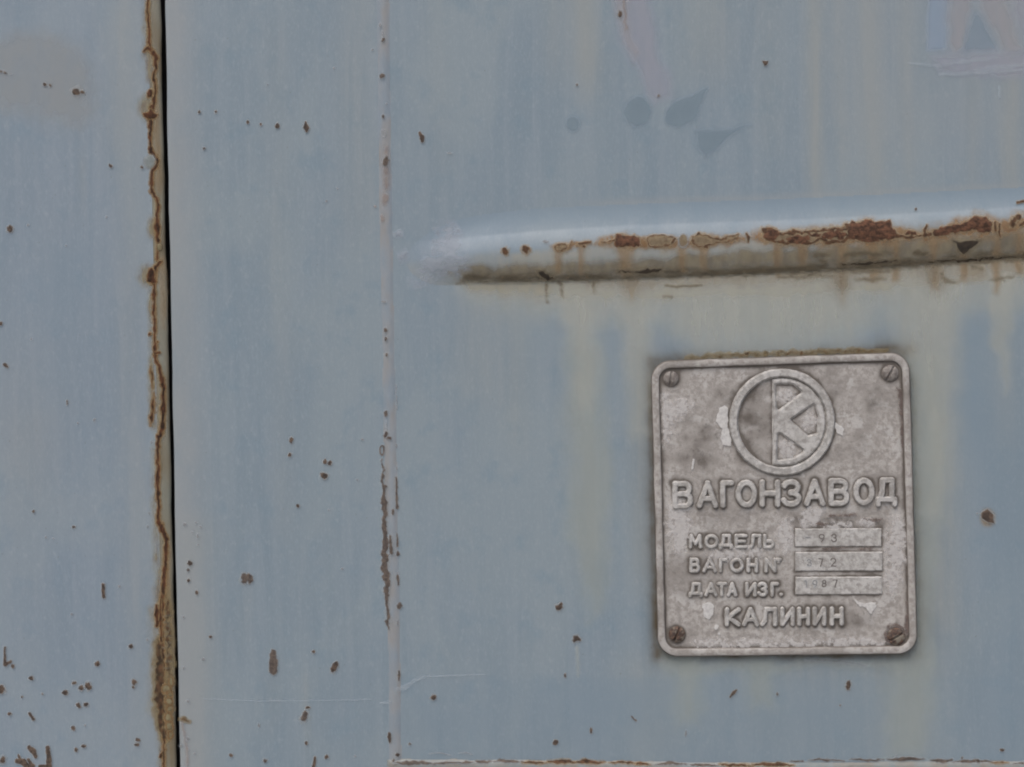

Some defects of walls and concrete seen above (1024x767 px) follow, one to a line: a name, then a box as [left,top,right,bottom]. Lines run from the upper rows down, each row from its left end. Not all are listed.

rust [447,200,1024,298]
rust [379,387,403,630]
rust [976,509,994,524]
rust [241,572,253,584]
rust [152,553,195,763]
rust [269,649,278,675]
rust [62,681,92,708]
rust [0,745,52,767]